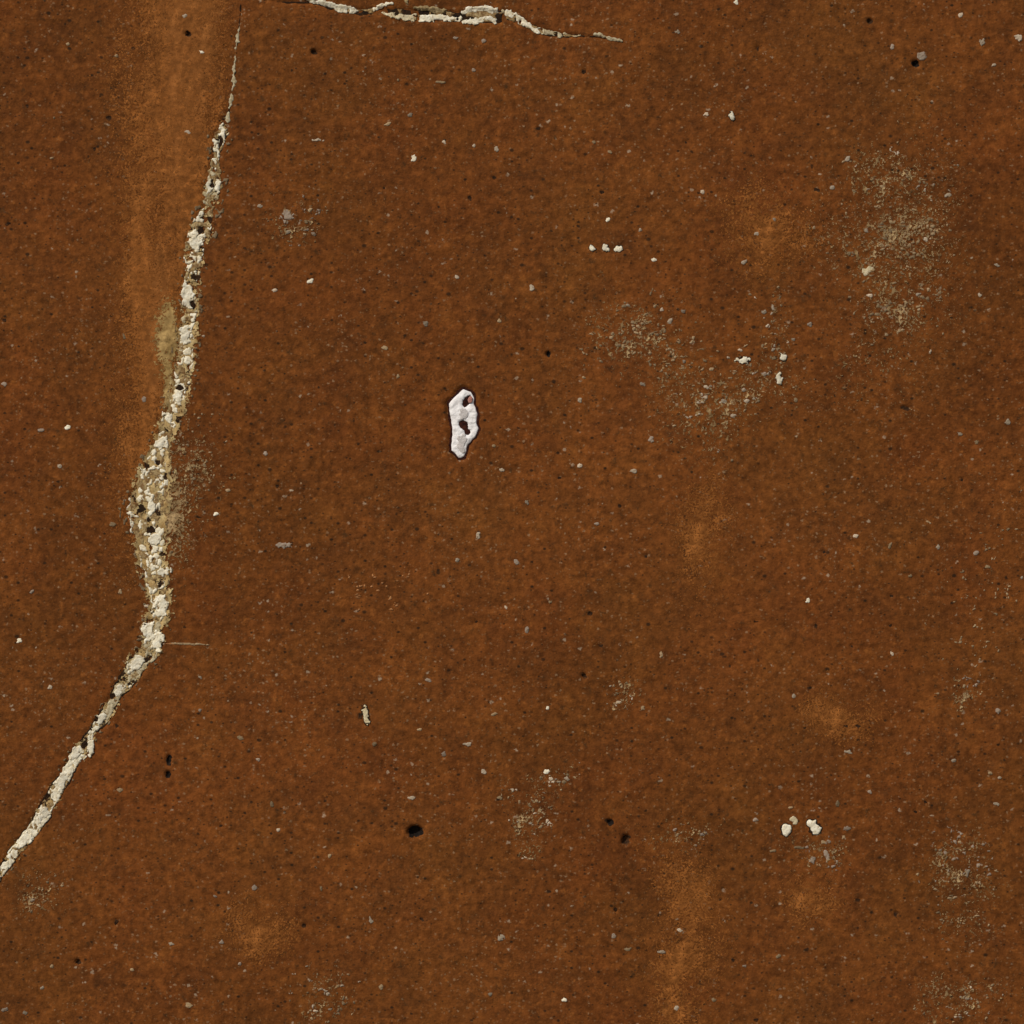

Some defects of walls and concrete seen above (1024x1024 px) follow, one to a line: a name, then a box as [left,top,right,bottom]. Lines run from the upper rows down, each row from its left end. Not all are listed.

crack [277,0,623,42]
crack [0,4,241,882]
spalling [447,387,481,460]